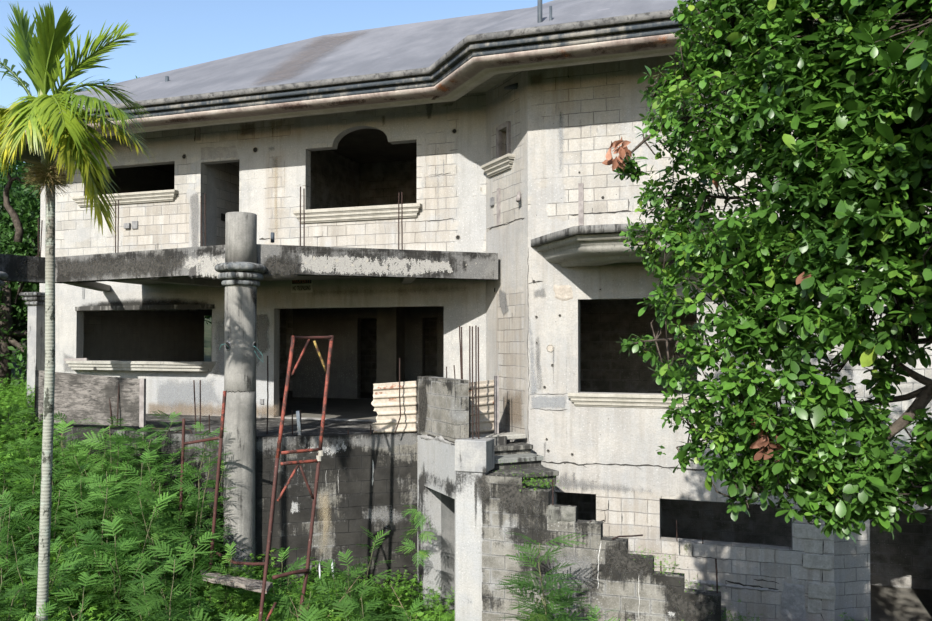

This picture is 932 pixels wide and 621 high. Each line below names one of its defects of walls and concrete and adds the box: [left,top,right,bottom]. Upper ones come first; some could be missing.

rust [497,51,572,64]
peeling [300,187,453,277]
crack [527,252,567,411]
leakage [308,441,347,455]
crack [541,461,717,472]
efflorescence [370,509,402,525]
leakage [474,475,545,531]
leakage [553,555,590,586]
leakage [607,545,648,585]
leakage [661,587,719,621]